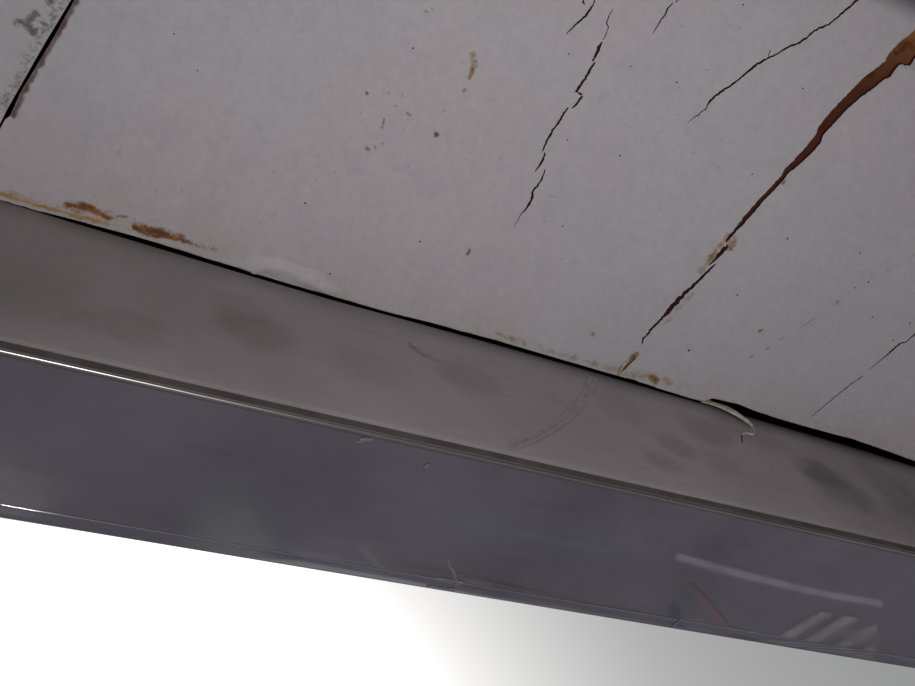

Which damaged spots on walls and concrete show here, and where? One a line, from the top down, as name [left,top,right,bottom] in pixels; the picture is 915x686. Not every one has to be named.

crack [514,0,613,226]
crack [688,0,859,123]
rust [0,184,225,255]
crack [619,30,915,373]
peeling [701,400,755,443]
crack [811,333,915,417]